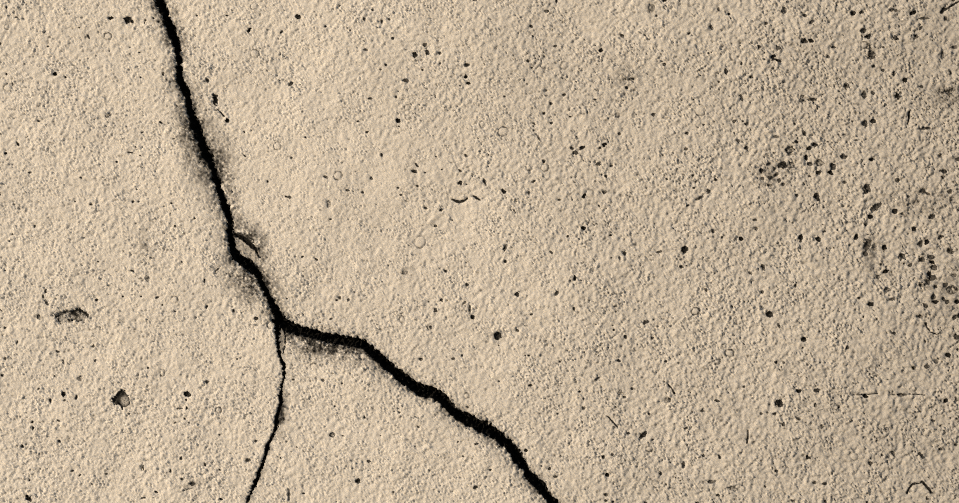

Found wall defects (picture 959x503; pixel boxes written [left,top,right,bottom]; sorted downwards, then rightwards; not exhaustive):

crack [155,0,559,503]